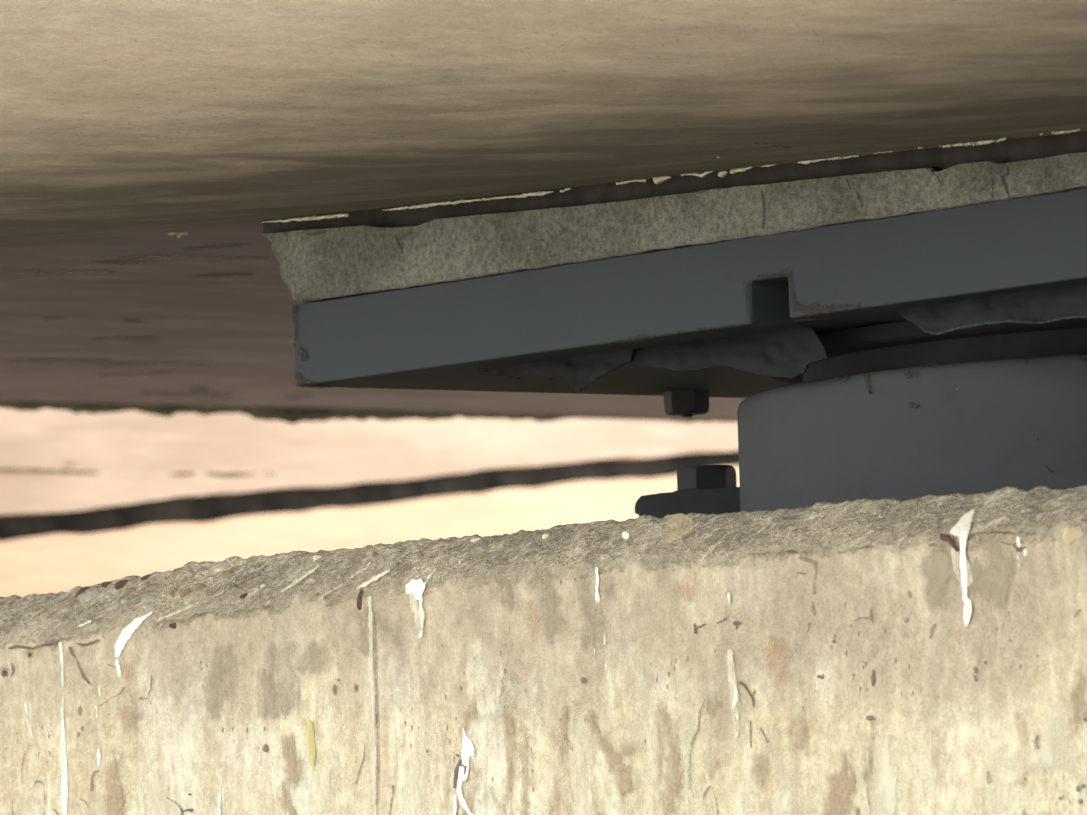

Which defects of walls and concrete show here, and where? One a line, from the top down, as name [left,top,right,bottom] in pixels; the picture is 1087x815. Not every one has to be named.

peeling [939,137,1007,148]
peeling [798,155,859,165]
peeling [616,164,776,185]
peeling [383,188,571,211]
flaking render [940,533,959,552]